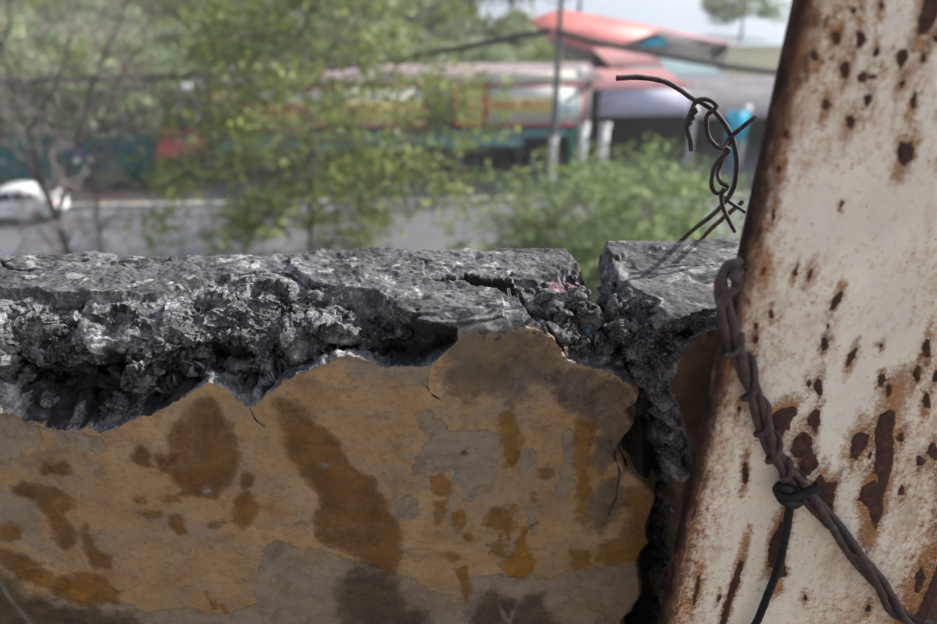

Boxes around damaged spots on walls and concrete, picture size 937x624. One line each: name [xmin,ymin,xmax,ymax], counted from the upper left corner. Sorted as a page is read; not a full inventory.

rust [806,0,937,182]
damp [14,483,110,569]
damp [0,526,138,624]
damp [133,398,253,504]
spalling [0,246,506,465]
damp [278,402,423,624]
peeling [411,408,503,502]
crack [592,431,627,522]
spalling [513,263,720,482]
rust [717,524,753,624]
rust [772,282,937,553]
rust [891,434,937,624]